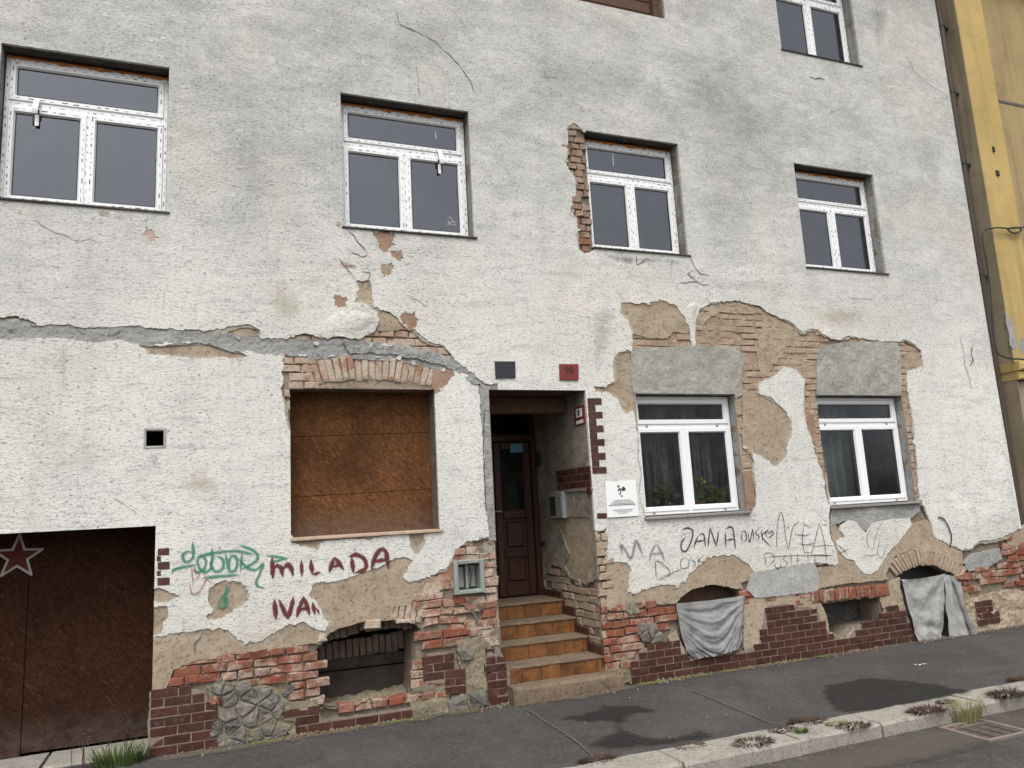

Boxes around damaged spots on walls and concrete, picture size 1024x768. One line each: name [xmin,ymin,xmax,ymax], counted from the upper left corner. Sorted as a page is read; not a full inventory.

crack [396,11,474,90]
flaking render [561,123,593,253]
crack [636,257,710,287]
flaking render [139,324,260,360]
flaking render [280,280,454,430]
flaking render [594,298,925,514]
flaking render [153,586,179,640]
flaking render [206,580,249,629]
flaking render [392,532,499,689]
flaking render [545,533,678,676]
flaking render [789,523,1024,606]
flaking render [168,641,330,705]